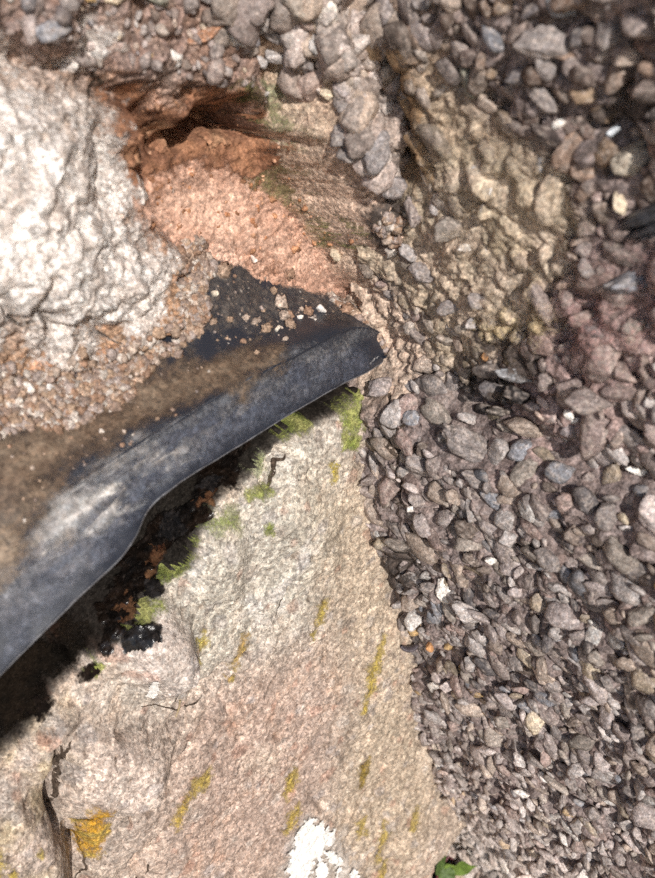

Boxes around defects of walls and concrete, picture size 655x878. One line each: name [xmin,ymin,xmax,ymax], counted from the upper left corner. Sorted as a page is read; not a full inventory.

corrosion [119,159,360,297]